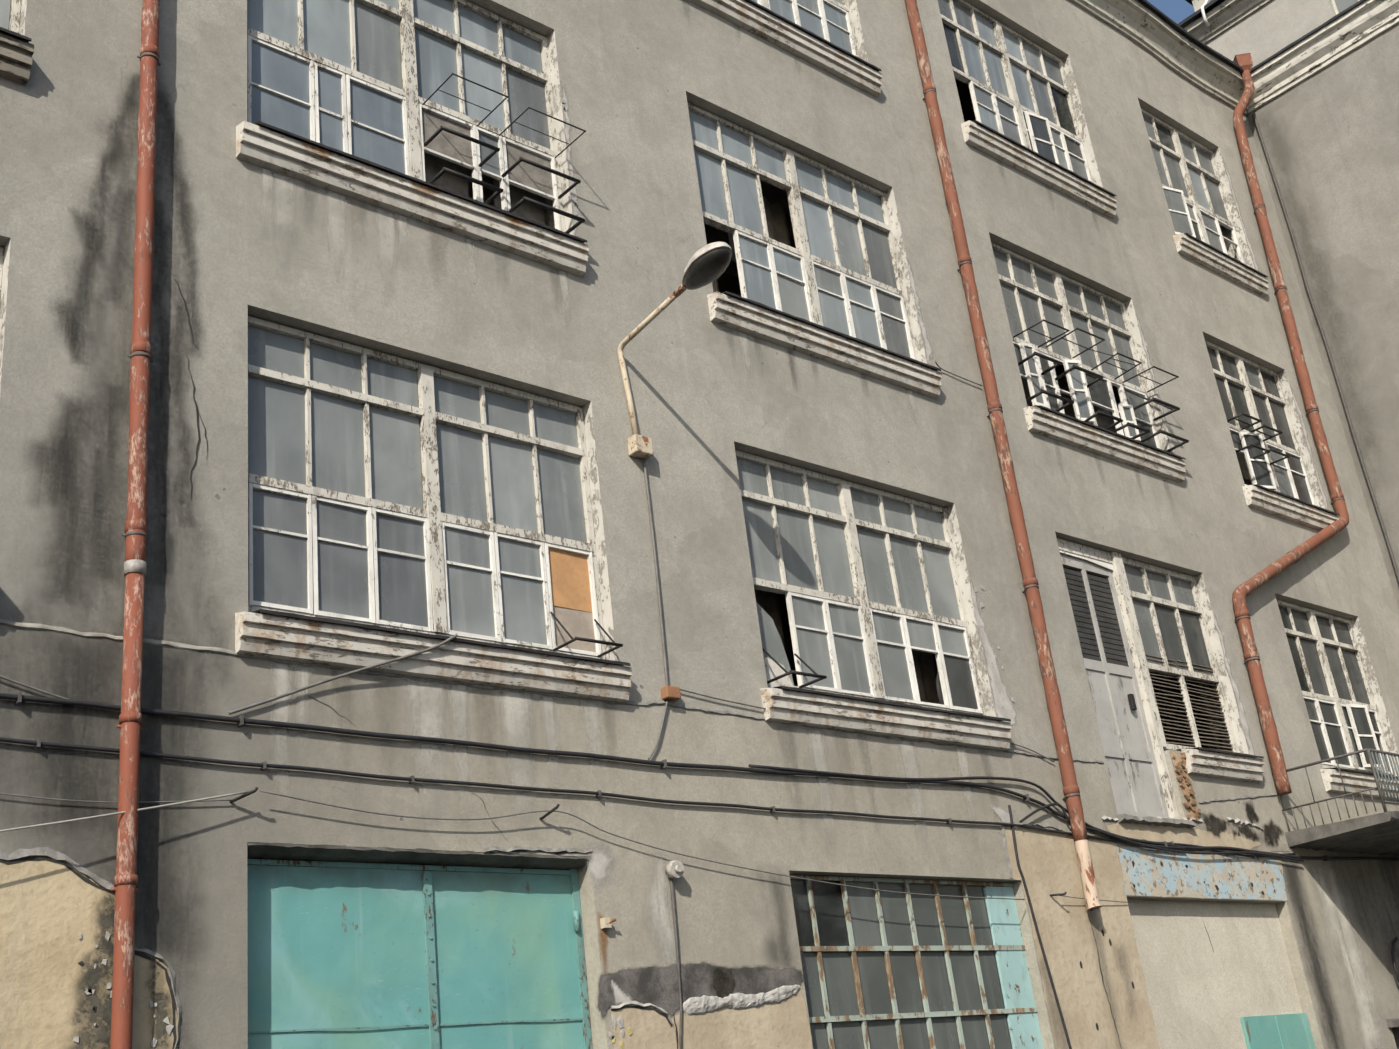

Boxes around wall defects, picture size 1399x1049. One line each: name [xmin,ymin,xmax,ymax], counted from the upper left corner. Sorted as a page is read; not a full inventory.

leakage [0,83,139,877]
leakage [136,105,221,953]
crack [174,278,208,500]
flaking render [0,846,115,1049]
flaking render [132,947,182,1049]
flaking render [597,962,812,1049]
flaking render [992,750,1290,1049]